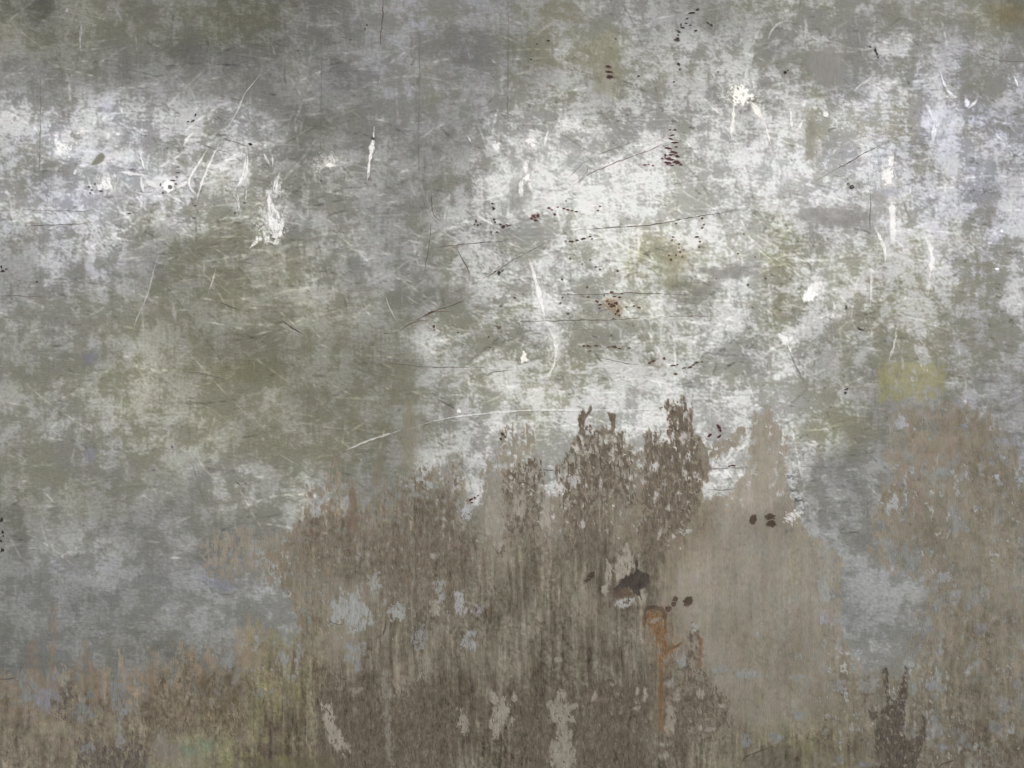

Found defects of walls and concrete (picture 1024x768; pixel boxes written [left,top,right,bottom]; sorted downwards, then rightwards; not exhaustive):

damp [330,391,657,534]
damp [611,557,694,613]
corrosion [633,596,705,739]
damp [867,665,929,768]